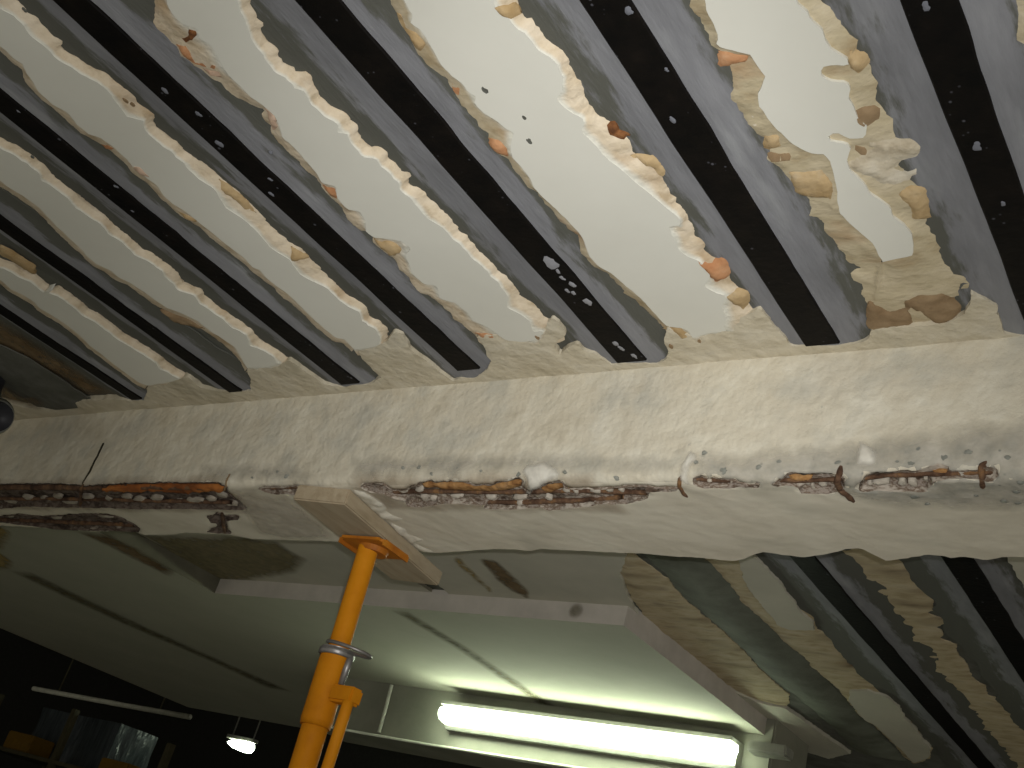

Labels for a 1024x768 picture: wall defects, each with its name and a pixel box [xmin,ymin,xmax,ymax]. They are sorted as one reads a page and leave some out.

flaking render [0,0,389,389]
flaking render [153,0,549,345]
flaking render [391,0,753,349]
flaking render [689,0,969,330]
crack [82,443,104,485]
spalling [0,481,247,534]
leakage [457,559,527,598]
leakage [523,463,558,493]
spalling [361,433,1024,511]
flaking render [620,553,790,706]
flaking render [705,558,933,764]
flaking render [843,548,1024,768]